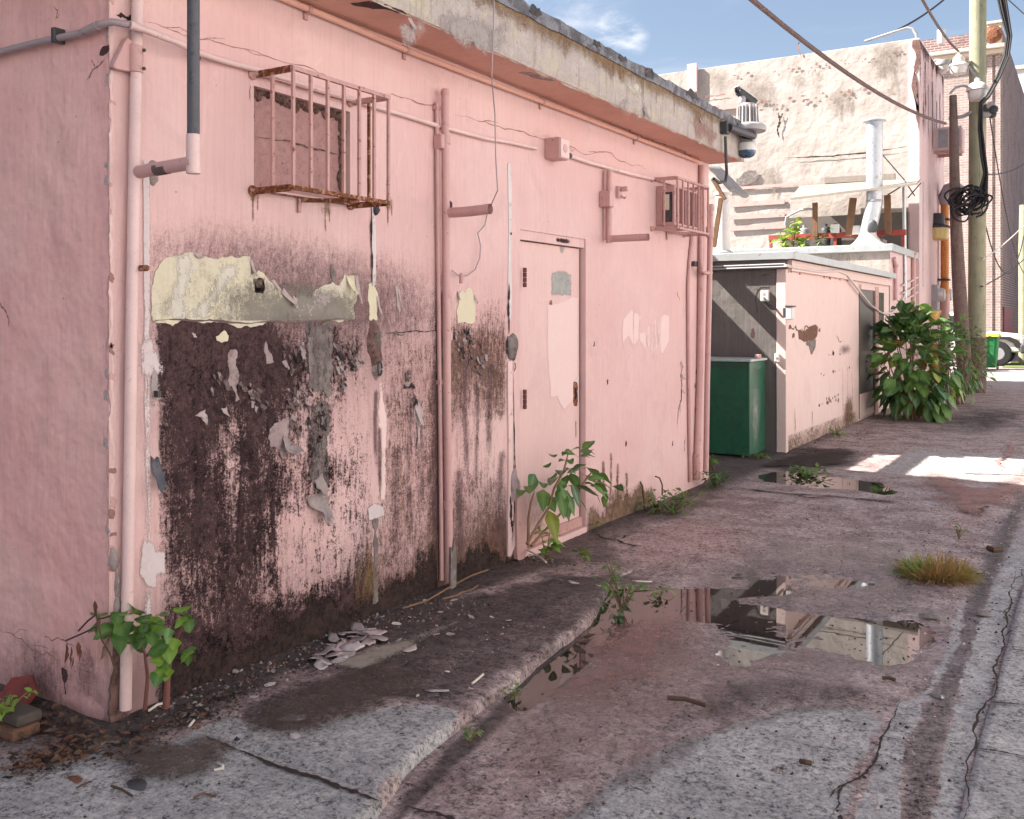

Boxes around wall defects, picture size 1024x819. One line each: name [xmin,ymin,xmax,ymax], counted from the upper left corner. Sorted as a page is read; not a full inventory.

peeling [151,252,383,527]
damp [139,293,515,701]
peeling [455,288,488,376]
flaking render [789,325,820,355]
crack [829,702,900,816]
crack [963,569,1023,819]